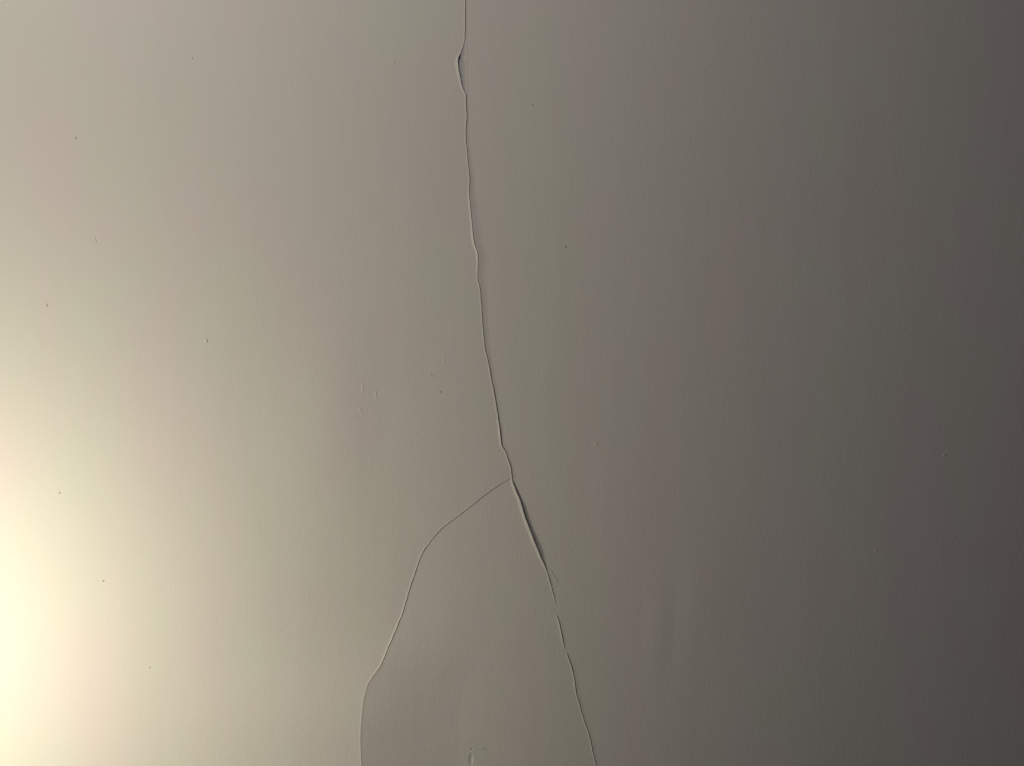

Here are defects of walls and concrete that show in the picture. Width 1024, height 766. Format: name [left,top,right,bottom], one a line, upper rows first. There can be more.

crack [461,0,469,40]
crack [359,95,515,766]
crack [544,568,600,766]